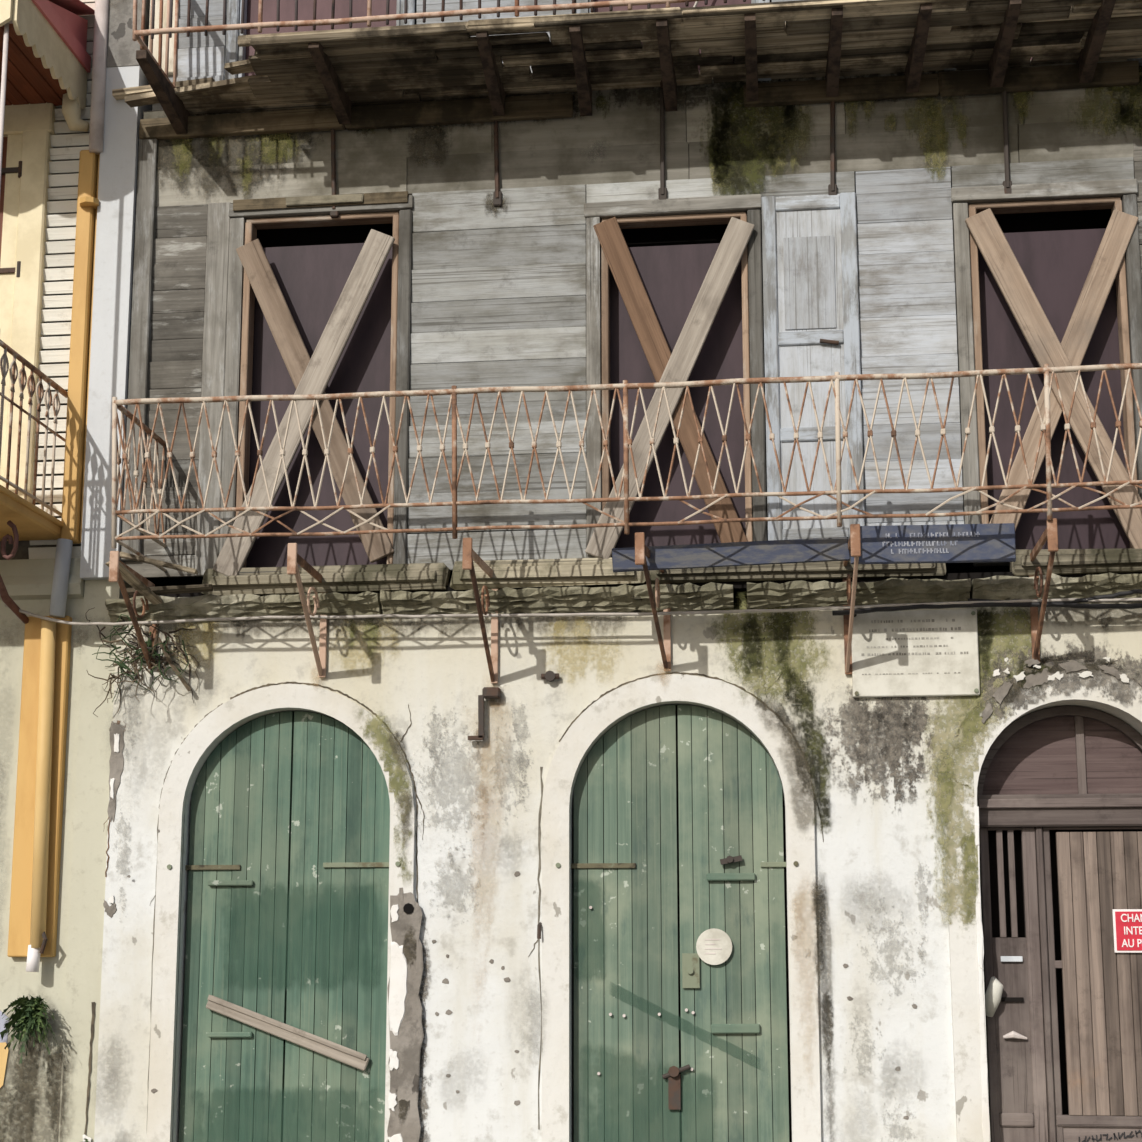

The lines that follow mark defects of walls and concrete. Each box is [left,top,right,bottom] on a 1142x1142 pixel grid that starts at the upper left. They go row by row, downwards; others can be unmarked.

water stain [677,77,825,195]
spalling [981,657,1142,724]
spalling [107,721,125,822]
water stain [737,611,1142,914]
spalling [103,896,117,918]
water stain [814,885,825,971]
flaking render [387,888,453,1142]
water stain [822,994,833,1069]
water stain [0,1026,64,1142]